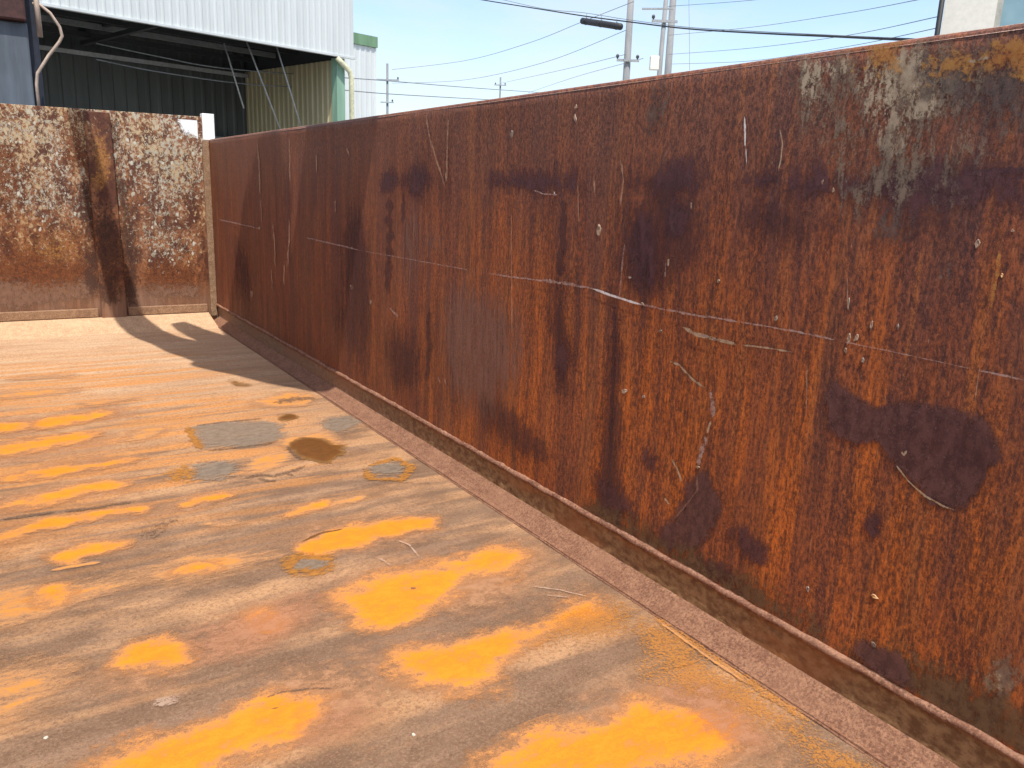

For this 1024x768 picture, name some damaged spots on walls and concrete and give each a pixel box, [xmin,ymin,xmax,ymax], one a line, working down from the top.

corrosion [851,41,903,80]
corrosion [922,36,1024,81]
corrosion [0,111,199,311]
corrosion [784,150,1024,226]
leakage [164,413,361,482]
corrosion [239,431,348,475]
corrosion [825,381,1002,511]
corrosion [659,470,768,583]
corrosion [0,494,882,768]
leakage [582,500,864,662]
corrosion [854,640,912,687]
leakage [885,646,1024,753]